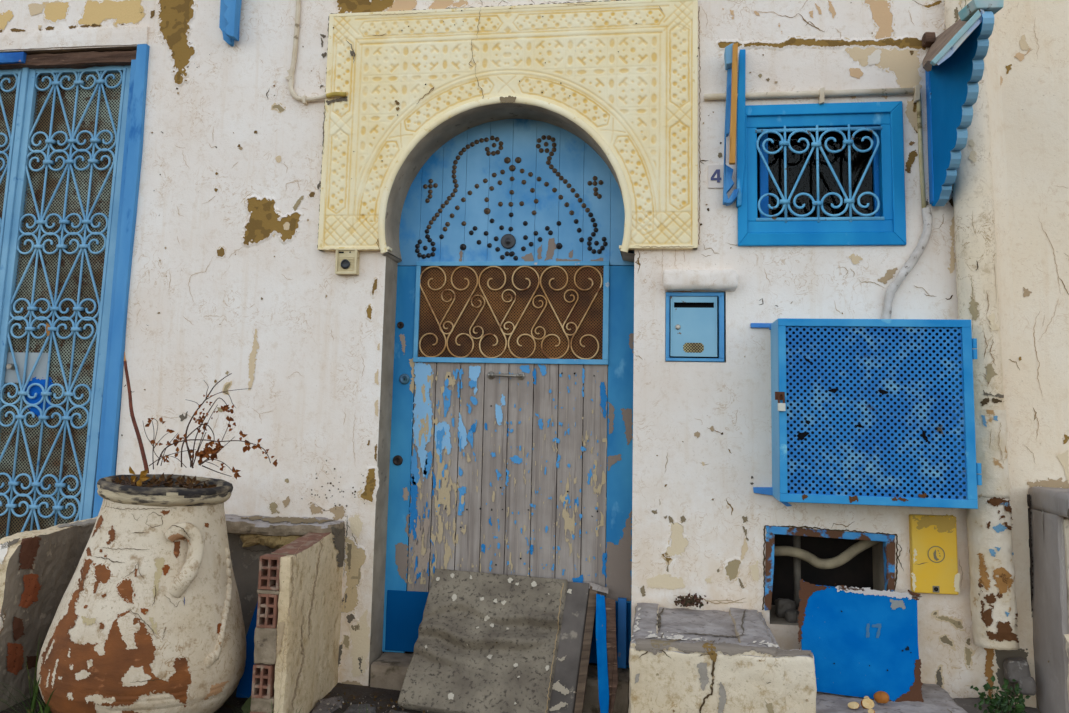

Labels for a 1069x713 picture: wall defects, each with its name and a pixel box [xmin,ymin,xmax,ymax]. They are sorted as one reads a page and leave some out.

peeling [0,10,25,33]
peeling [334,0,470,26]
peeling [715,0,930,173]
spalling [214,181,321,260]
spalling [338,535,369,686]
crack [639,521,922,713]